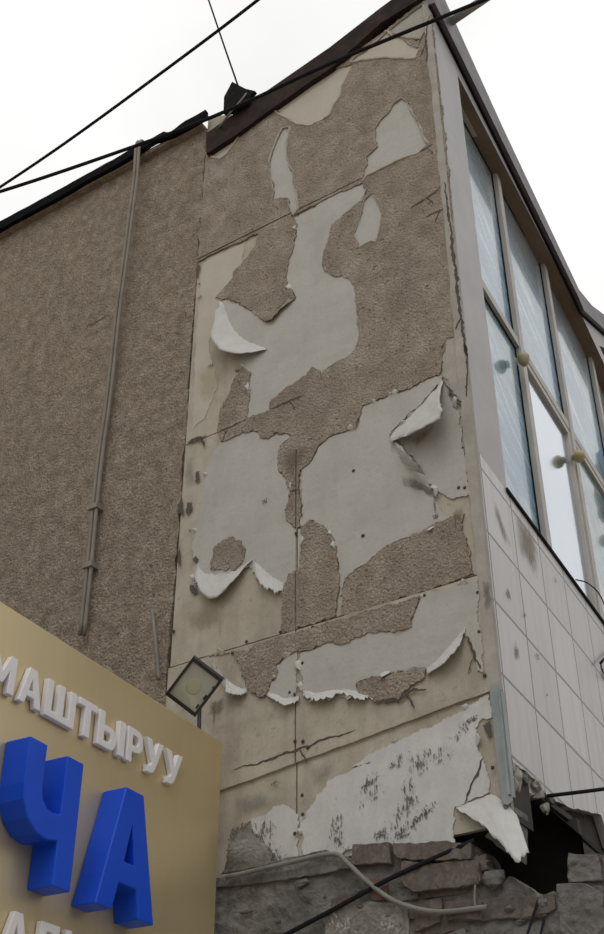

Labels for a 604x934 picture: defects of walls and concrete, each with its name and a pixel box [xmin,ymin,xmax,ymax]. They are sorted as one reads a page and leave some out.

peeling [192,2,429,429]
peeling [177,337,469,599]
peeling [207,647,247,696]
peeling [266,578,484,706]
crack [233,730,354,770]
peeling [221,695,584,895]
crack [465,759,482,802]